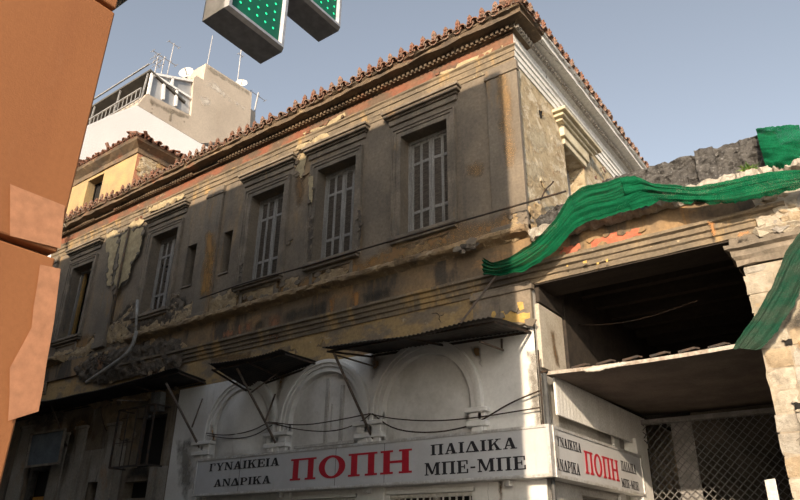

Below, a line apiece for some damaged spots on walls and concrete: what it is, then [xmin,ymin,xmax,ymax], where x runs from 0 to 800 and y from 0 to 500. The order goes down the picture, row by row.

peeling [292,112,346,204]
peeling [104,194,184,295]
peeling [558,228,646,256]
flaking render [54,298,193,362]
flaking render [209,276,301,312]
peeling [491,302,537,327]